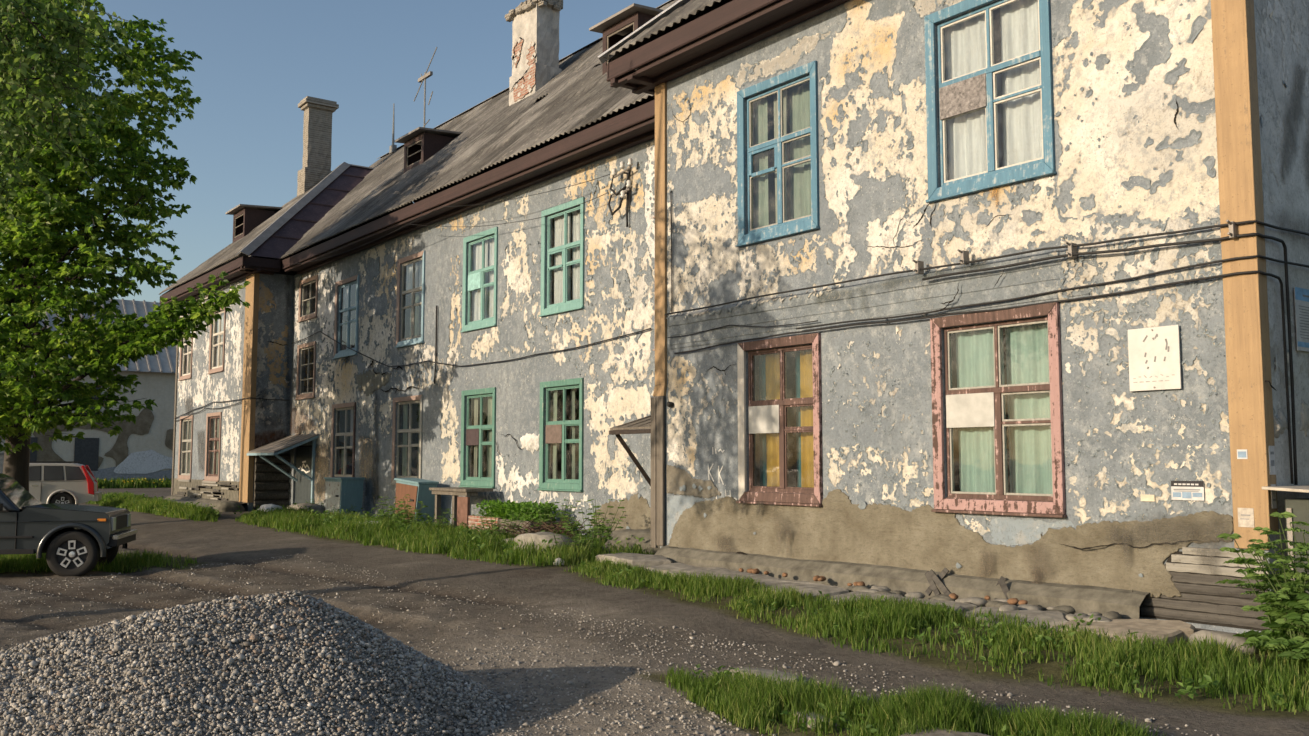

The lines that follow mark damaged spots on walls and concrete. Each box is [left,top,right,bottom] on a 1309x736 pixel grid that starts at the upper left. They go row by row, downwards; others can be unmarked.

peeling [177,0,1234,598]
water stain [1283,70,1309,178]